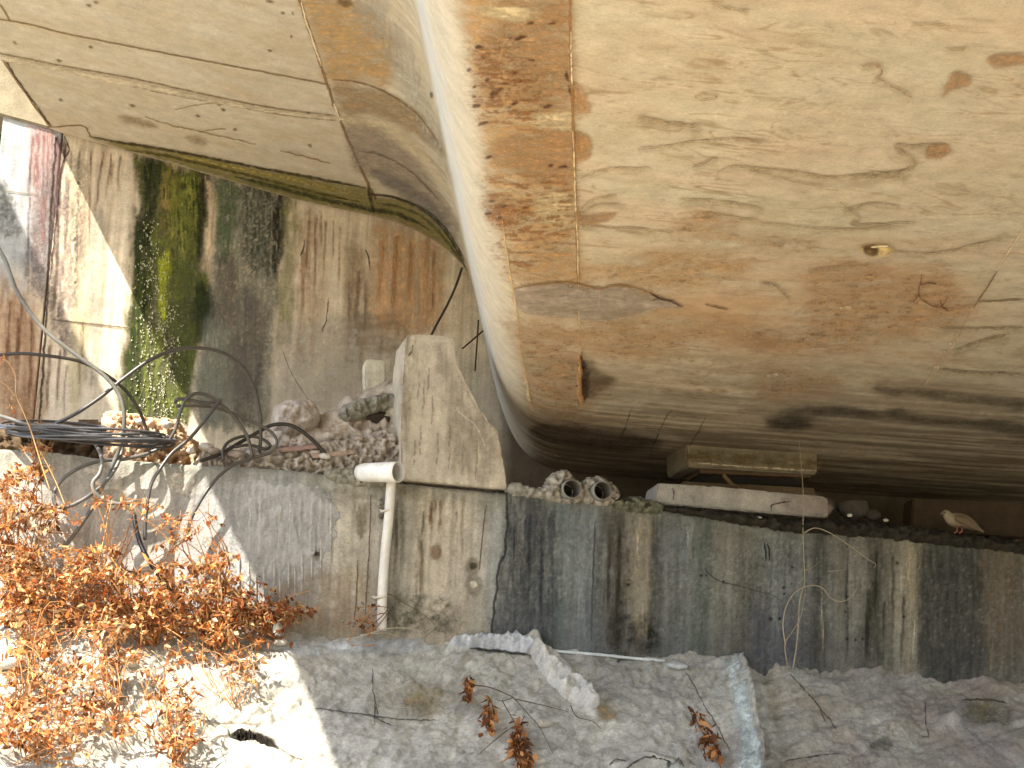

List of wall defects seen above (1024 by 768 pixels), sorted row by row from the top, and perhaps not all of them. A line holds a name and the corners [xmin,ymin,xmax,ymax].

rust [486,7,530,20]
damp [90,5,465,426]
damp [493,500,555,645]
damp [586,522,654,640]
damp [865,540,940,654]